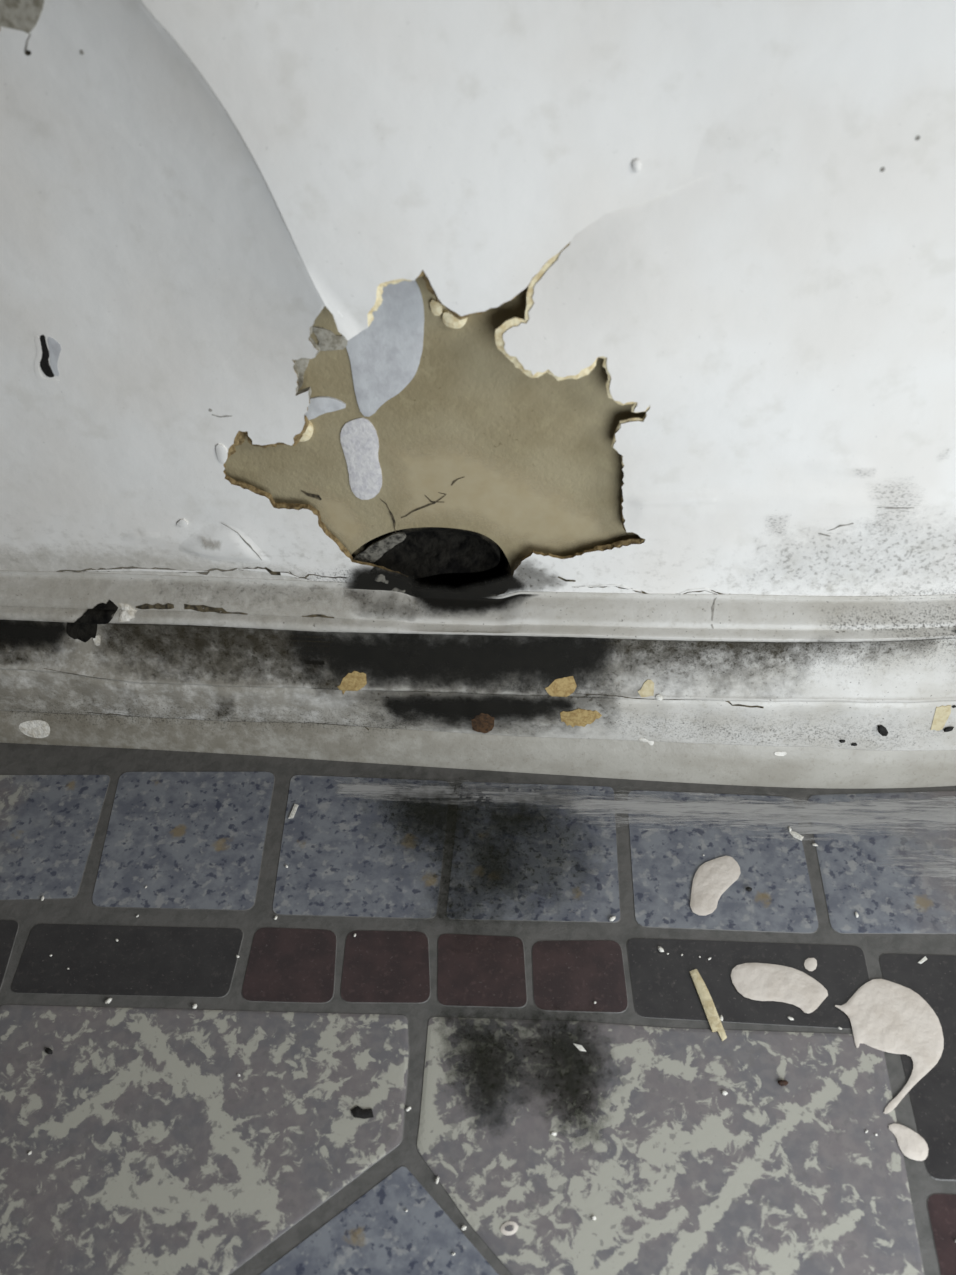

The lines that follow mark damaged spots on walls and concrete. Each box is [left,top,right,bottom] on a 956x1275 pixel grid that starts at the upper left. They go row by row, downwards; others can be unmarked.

peeling [141,0,899,590]
peeling [34,335,61,383]
damp [0,620,69,662]
damp [318,567,558,615]
damp [103,610,956,729]
damp [337,784,956,922]
damp [454,1017,600,1124]